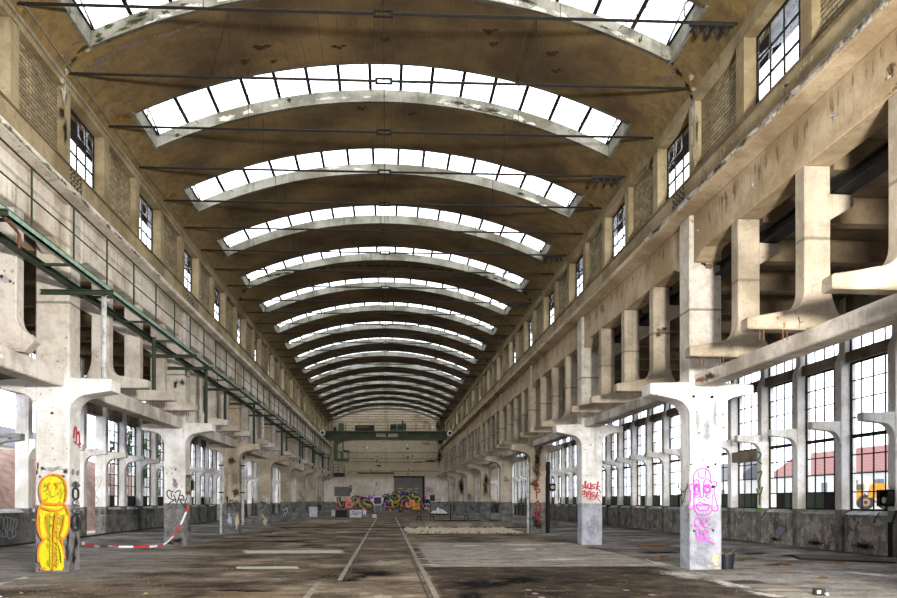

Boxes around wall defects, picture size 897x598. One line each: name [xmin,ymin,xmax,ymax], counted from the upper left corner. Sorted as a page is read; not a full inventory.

peeling [496,0,567,17]
peeling [437,98,536,125]